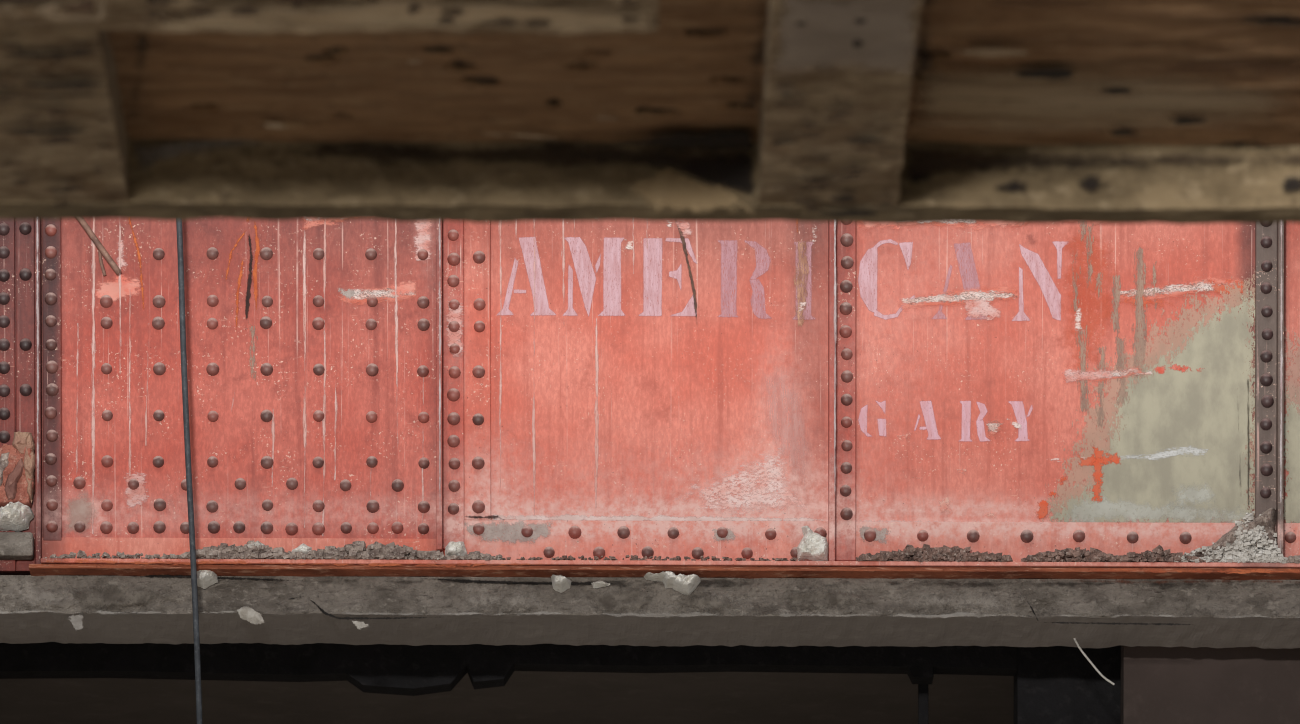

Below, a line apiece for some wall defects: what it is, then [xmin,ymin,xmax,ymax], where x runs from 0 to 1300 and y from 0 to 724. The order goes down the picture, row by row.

spalling [0,219,39,508]
rust [225,220,260,327]
peeling [390,281,416,296]
peeling [964,298,1001,320]
peeling [1036,222,1255,523]
peeling [1280,222,1300,523]